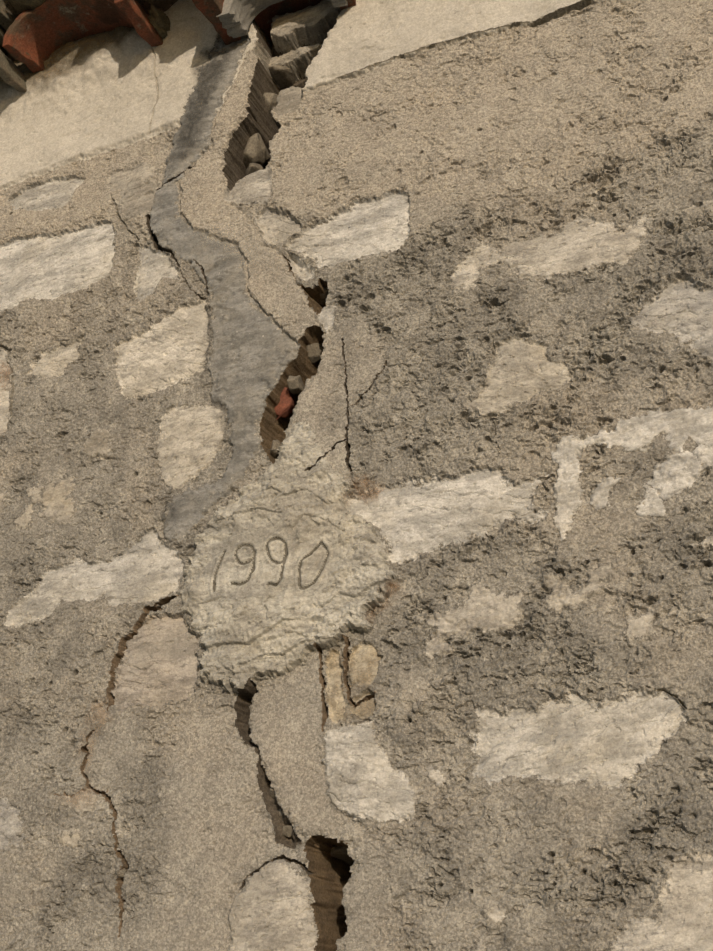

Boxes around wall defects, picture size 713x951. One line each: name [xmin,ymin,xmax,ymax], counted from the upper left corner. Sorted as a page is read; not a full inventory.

crack [148,44,159,135]
crack [156,19,317,191]
crack [110,193,209,300]
crack [259,255,387,472]
crack [54,595,179,938]
crack [234,678,313,889]
crack [313,634,376,732]